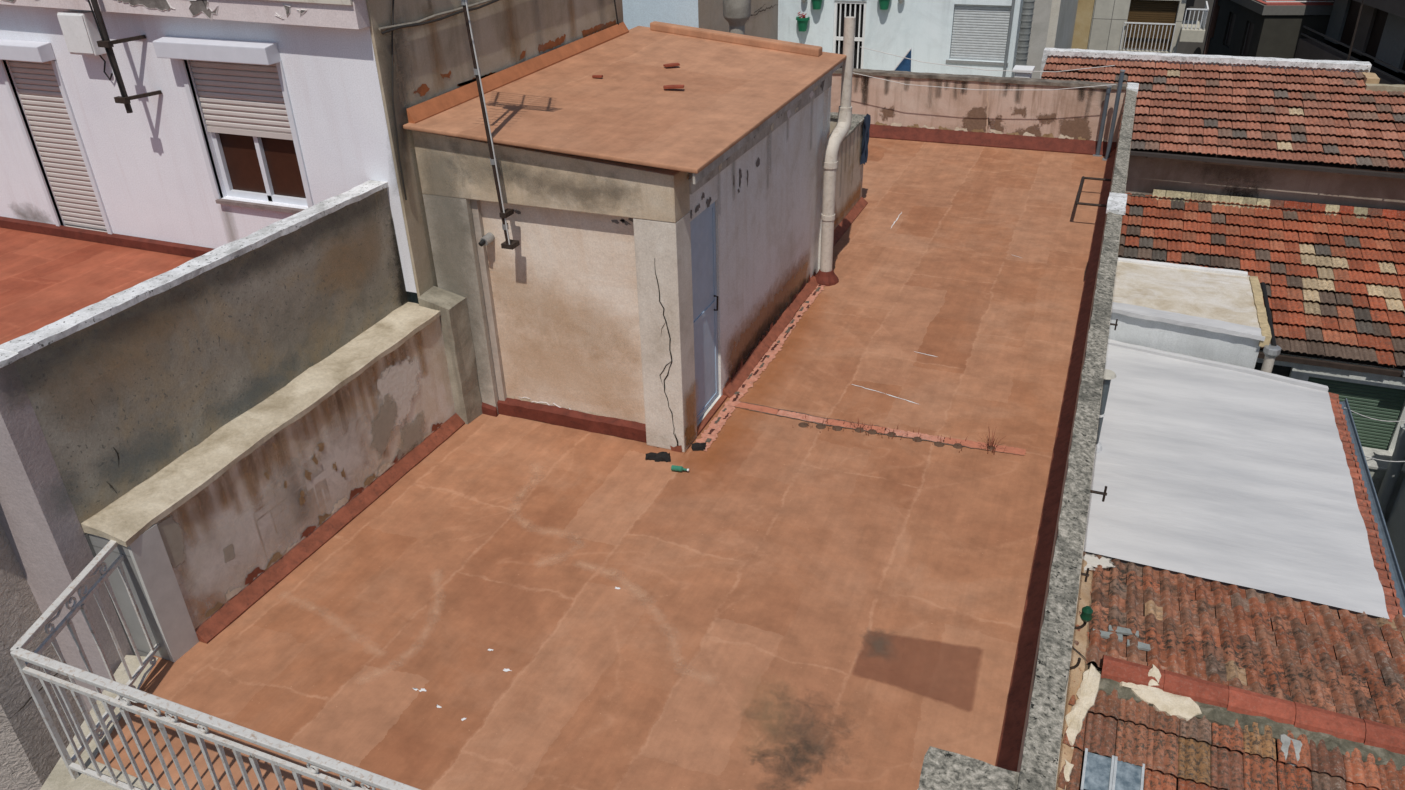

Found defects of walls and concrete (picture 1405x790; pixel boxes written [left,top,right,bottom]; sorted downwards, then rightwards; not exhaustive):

peeling [117,0,219,21]
flaking render [875,82,1108,142]
crack [654,258,678,446]
leakage [729,261,808,379]
peeling [181,356,443,618]